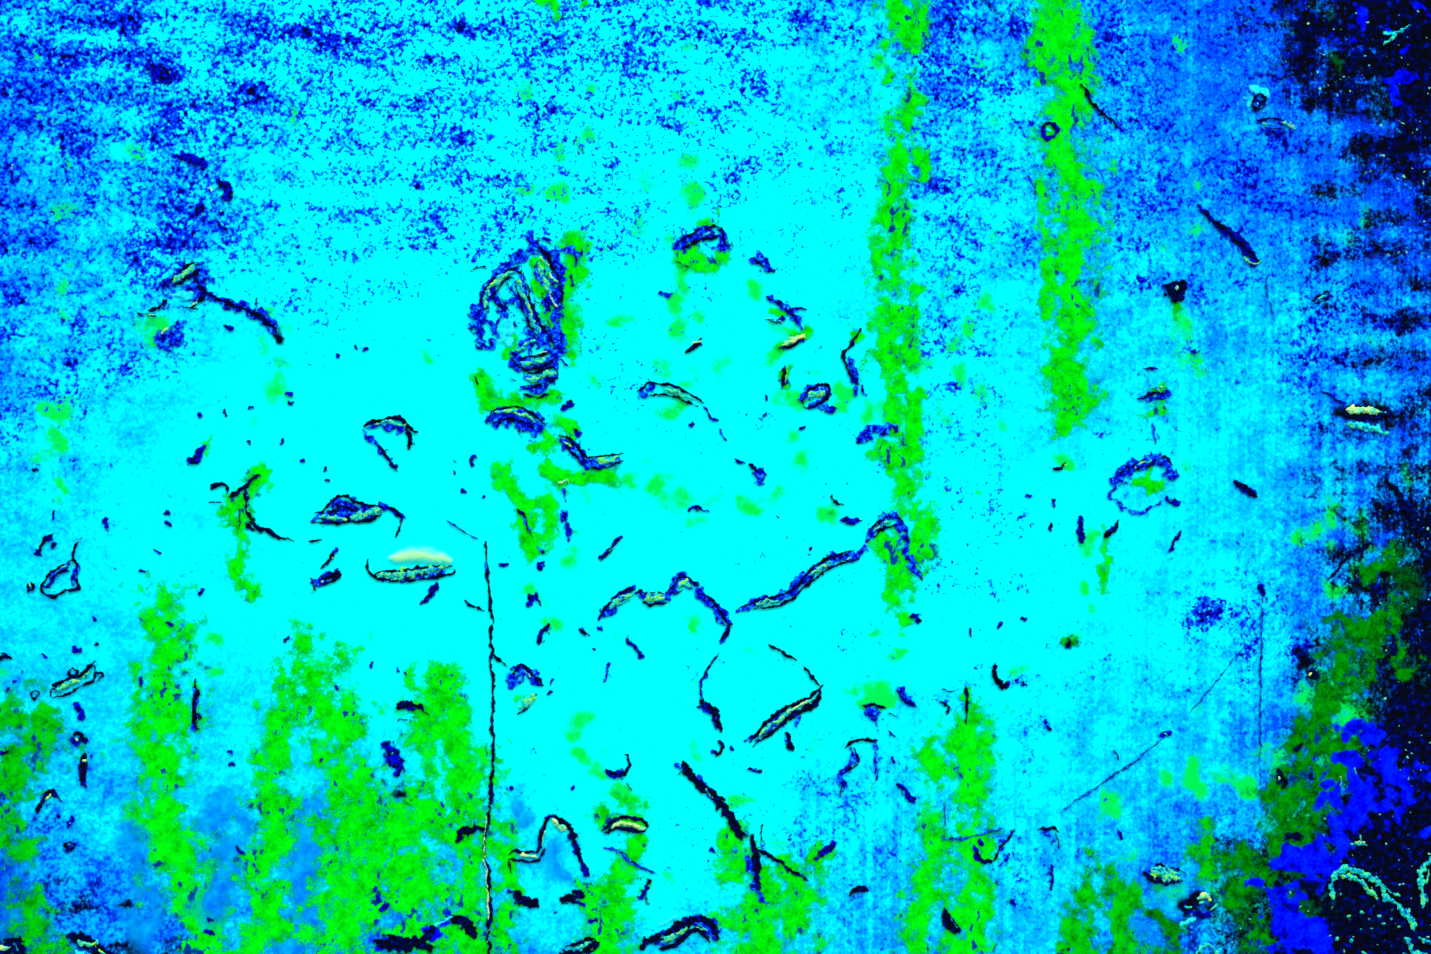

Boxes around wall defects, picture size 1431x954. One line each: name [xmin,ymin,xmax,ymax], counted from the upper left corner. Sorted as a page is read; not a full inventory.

crack [197,289,284,344]
peeling [672,207,733,274]
peeling [748,250,776,273]
peeling [467,229,624,542]
peeling [309,466,406,591]
crack [769,644,820,686]
crack [446,520,508,954]
crack [674,619,809,904]
damp [0,852,30,931]
damp [118,889,163,949]
damp [199,790,254,919]
damp [275,800,324,954]